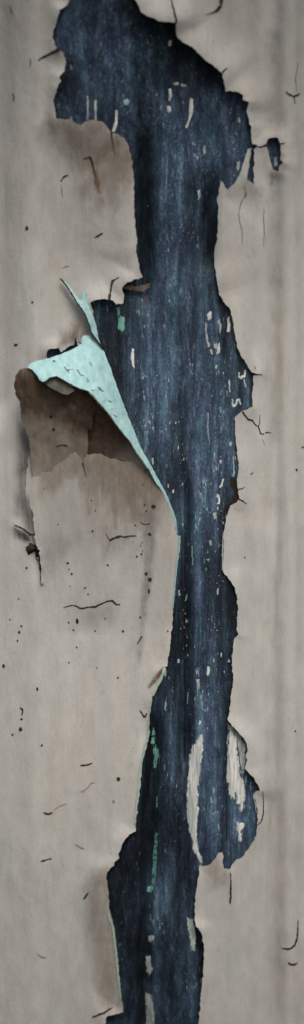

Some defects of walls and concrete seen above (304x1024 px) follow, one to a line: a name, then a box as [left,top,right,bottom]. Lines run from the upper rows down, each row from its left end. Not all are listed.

peeling [46,338,78,358]
crack [242,411,270,444]
water stain [42,454,160,499]
peeling [53,0,283,1024]
crack [106,522,150,550]
crack [14,525,43,586]
crack [63,600,120,609]